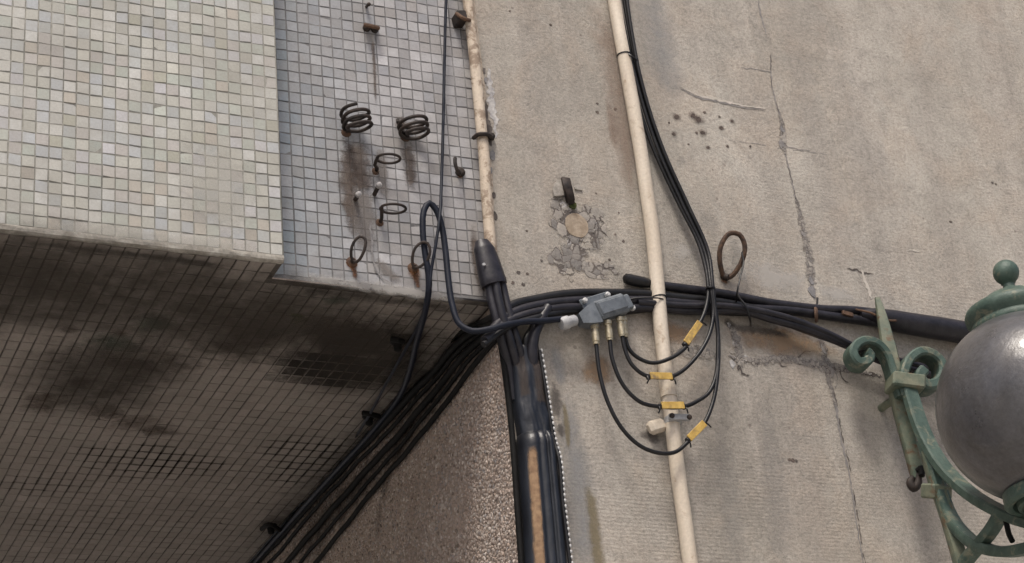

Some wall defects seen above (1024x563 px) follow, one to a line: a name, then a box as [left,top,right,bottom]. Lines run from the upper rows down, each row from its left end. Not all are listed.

rust [339,145,371,225]
flaking render [540,197,625,282]
crack [734,0,827,299]
leakage [0,242,427,416]
crack [729,339,881,563]